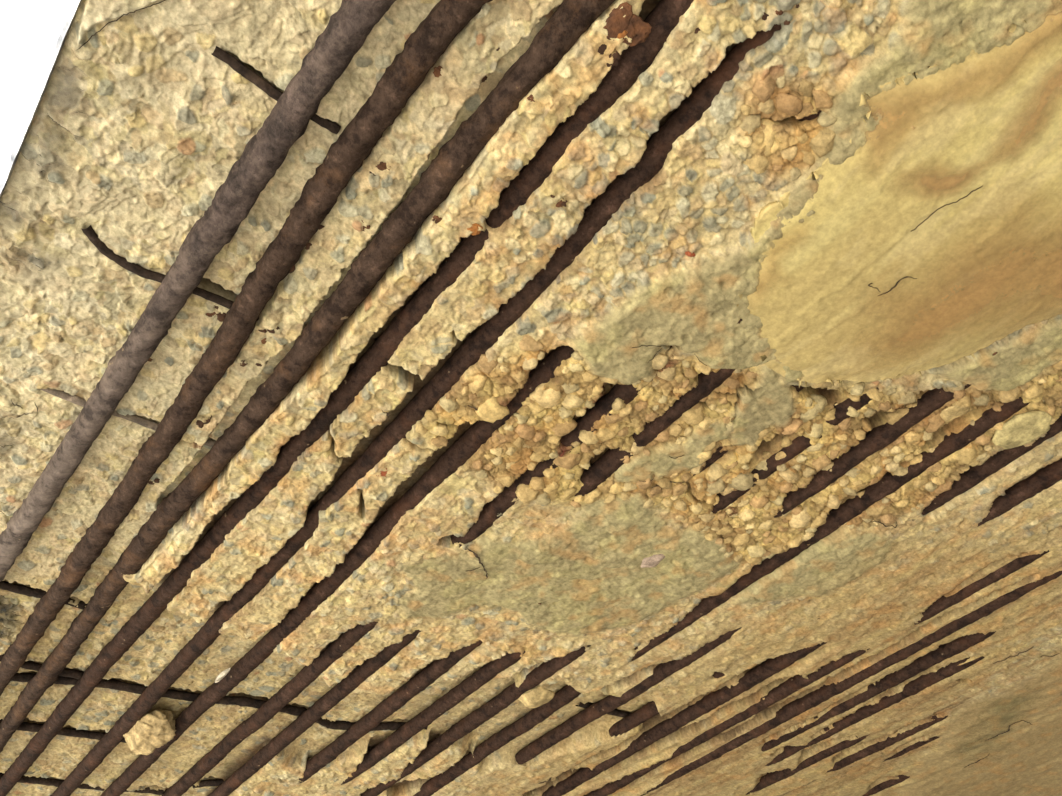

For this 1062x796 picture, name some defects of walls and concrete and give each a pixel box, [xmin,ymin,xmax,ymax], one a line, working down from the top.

corrosion [597,2,652,67]
corrosion [205,305,226,322]
spalling [0,0,910,720]
spalling [746,314,1062,392]
spalling [120,431,1062,796]
spalling [0,684,141,796]